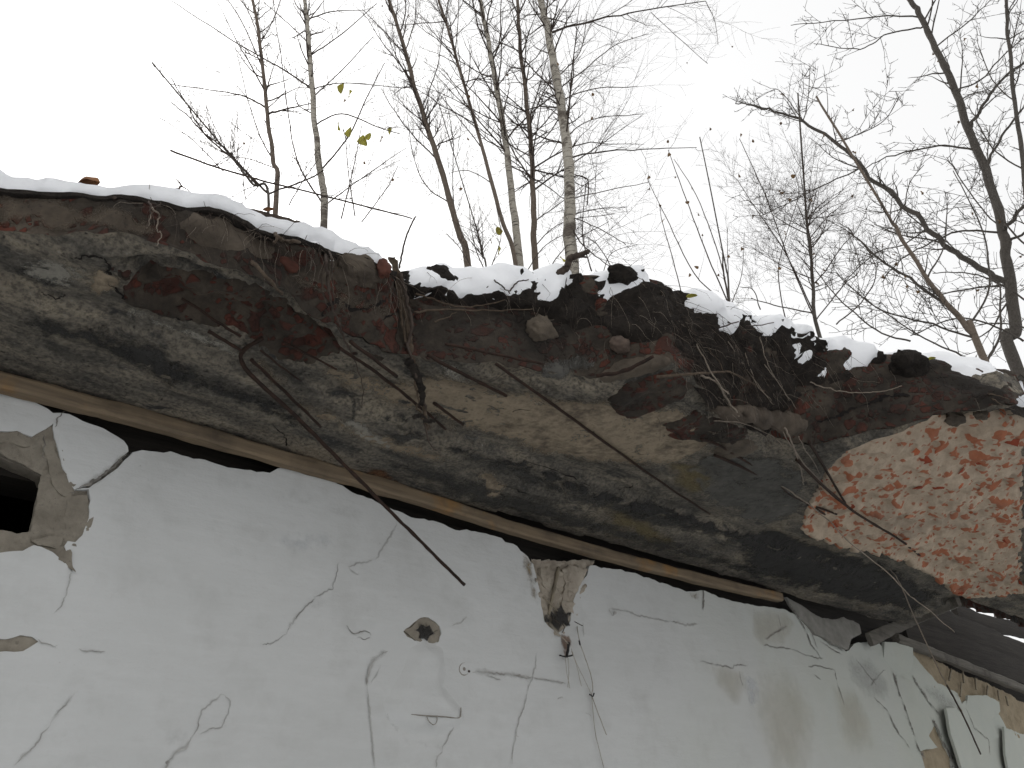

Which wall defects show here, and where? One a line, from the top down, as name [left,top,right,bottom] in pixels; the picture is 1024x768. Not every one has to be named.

spalling [0,196,705,419]
spalling [0,424,126,572]
damp [300,366,798,582]
spalling [663,347,1024,599]
crack [16,690,78,764]
crack [165,694,231,768]
crack [347,626,387,768]
spalling [403,617,440,643]
crack [473,662,564,763]
peeling [784,597,861,650]
crack [765,601,990,768]
peeling [913,651,1024,738]